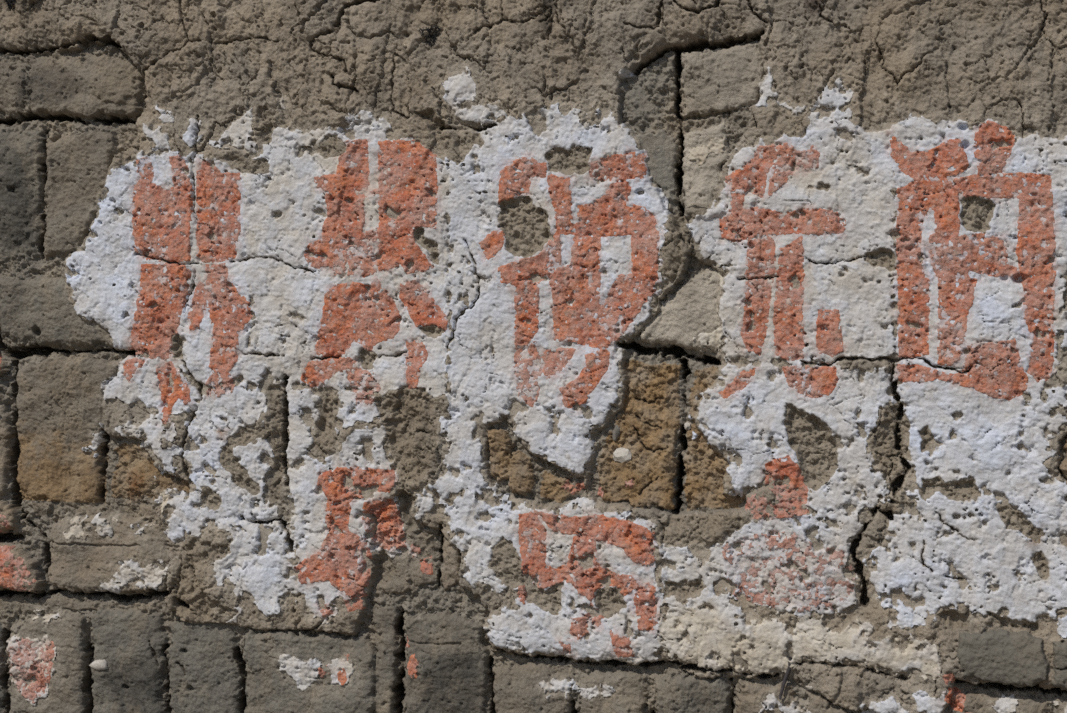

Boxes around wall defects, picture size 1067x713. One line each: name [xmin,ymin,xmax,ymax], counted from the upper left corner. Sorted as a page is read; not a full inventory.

crack [142,0,279,97]
crack [309,0,380,95]
crack [390,52,410,119]
crack [473,0,541,35]
crack [623,0,769,30]
crack [192,114,200,215]
peeling [887,113,983,188]
peeling [990,131,1067,377]
peeling [862,189,1067,638]
peeling [295,577,351,624]
peeling [770,572,834,617]
flaking render [912,682,1067,713]